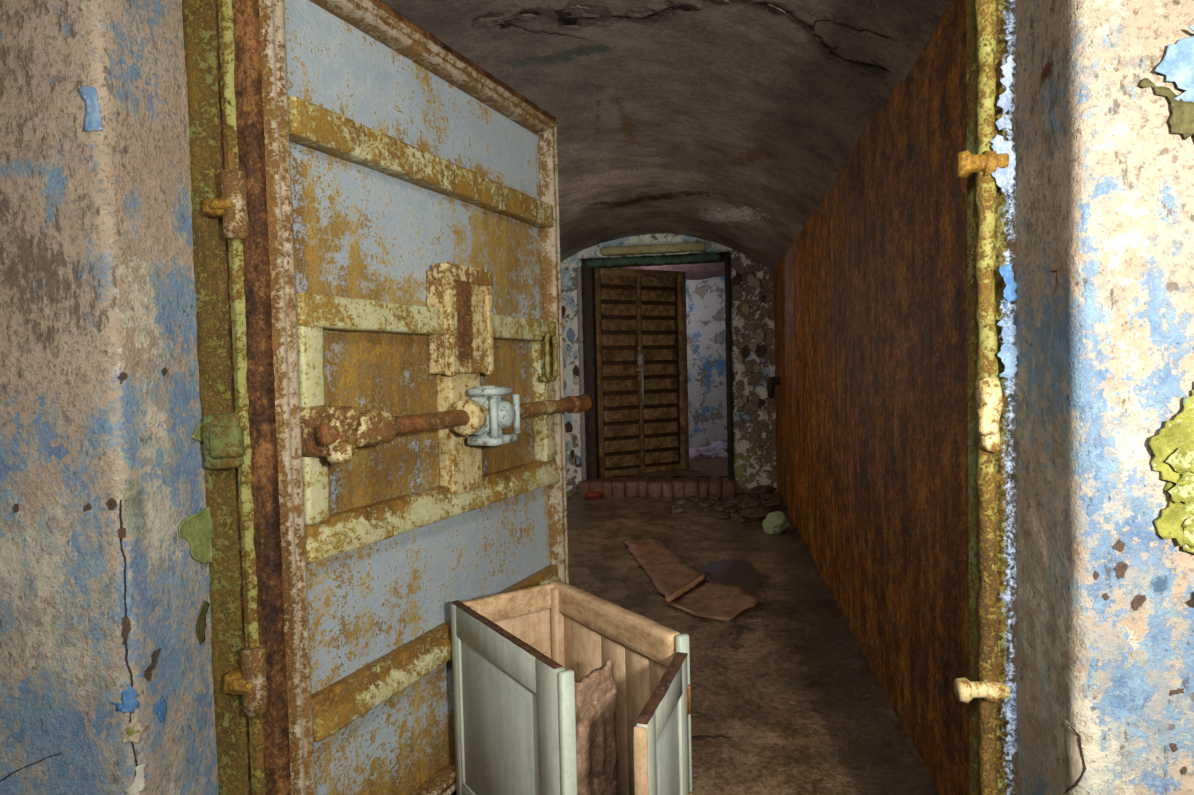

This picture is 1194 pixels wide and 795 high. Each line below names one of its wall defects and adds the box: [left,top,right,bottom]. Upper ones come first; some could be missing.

crack [472,0,900,80]
peeling [1139,26,1194,140]
peeling [562,306,579,389]
peeling [737,331,765,373]
peeling [990,0,1018,795]
peeling [565,421,582,467]
peeling [1149,390,1194,554]